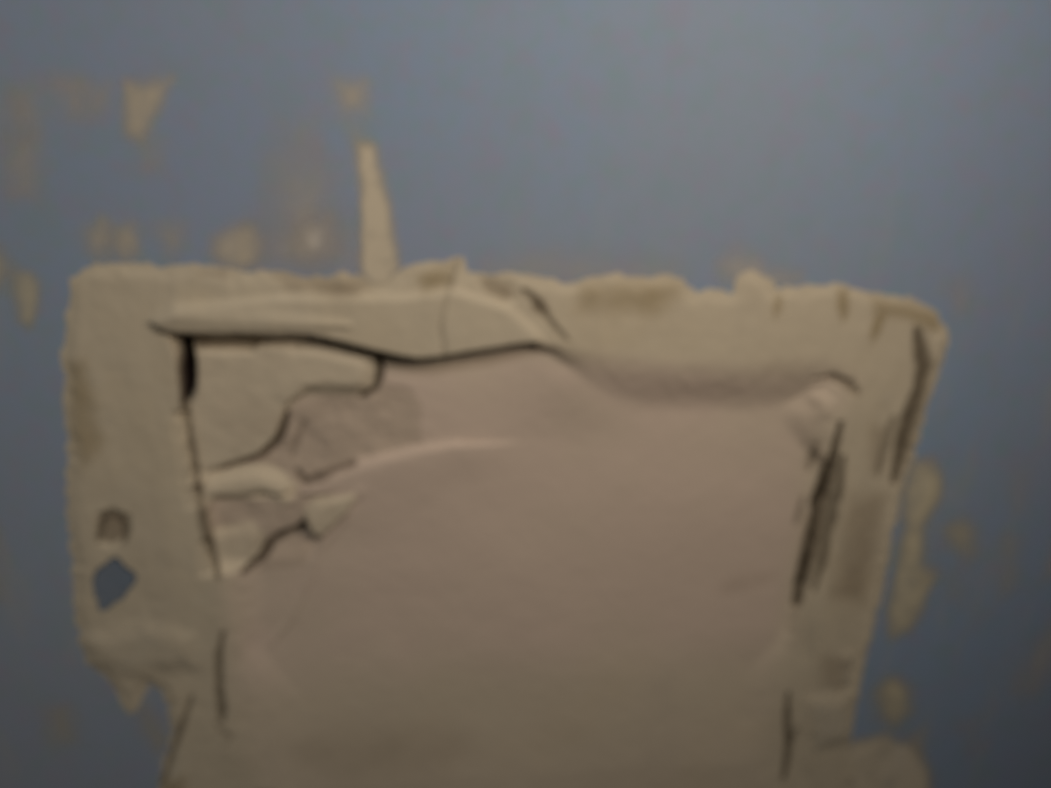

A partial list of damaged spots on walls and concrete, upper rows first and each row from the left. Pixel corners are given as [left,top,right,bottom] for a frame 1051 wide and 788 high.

spalling [94,557,137,611]
crack [181,334,197,404]
crack [190,428,306,573]
spalling [191,335,424,575]
crack [360,350,383,397]
crack [792,421,844,604]
crack [891,329,928,482]